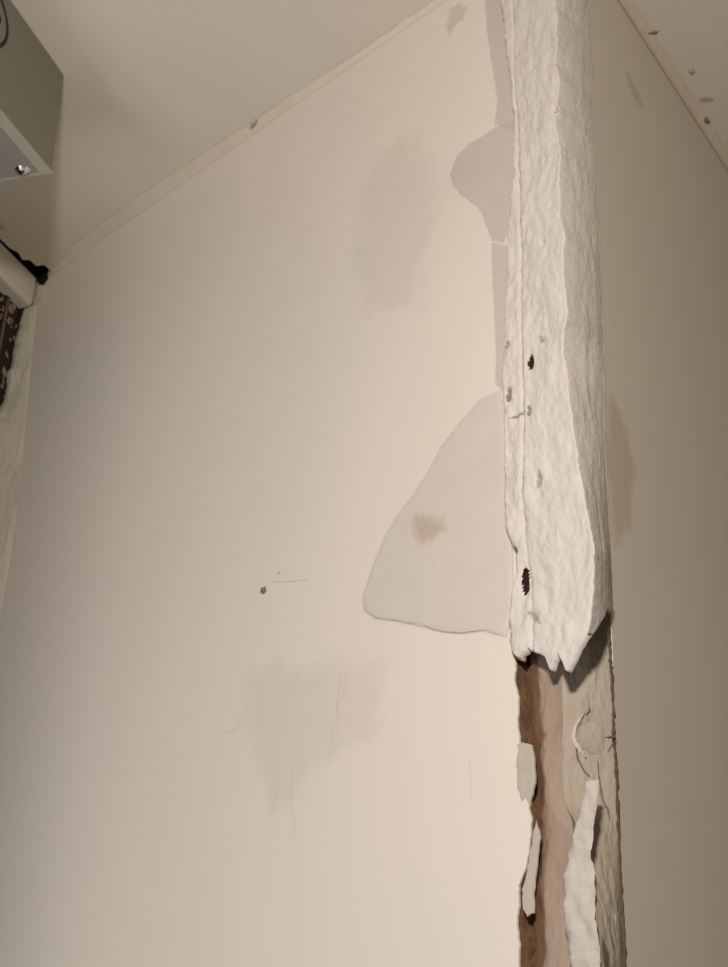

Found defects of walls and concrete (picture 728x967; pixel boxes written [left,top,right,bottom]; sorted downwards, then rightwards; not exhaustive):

spalling [515,614,623,967]